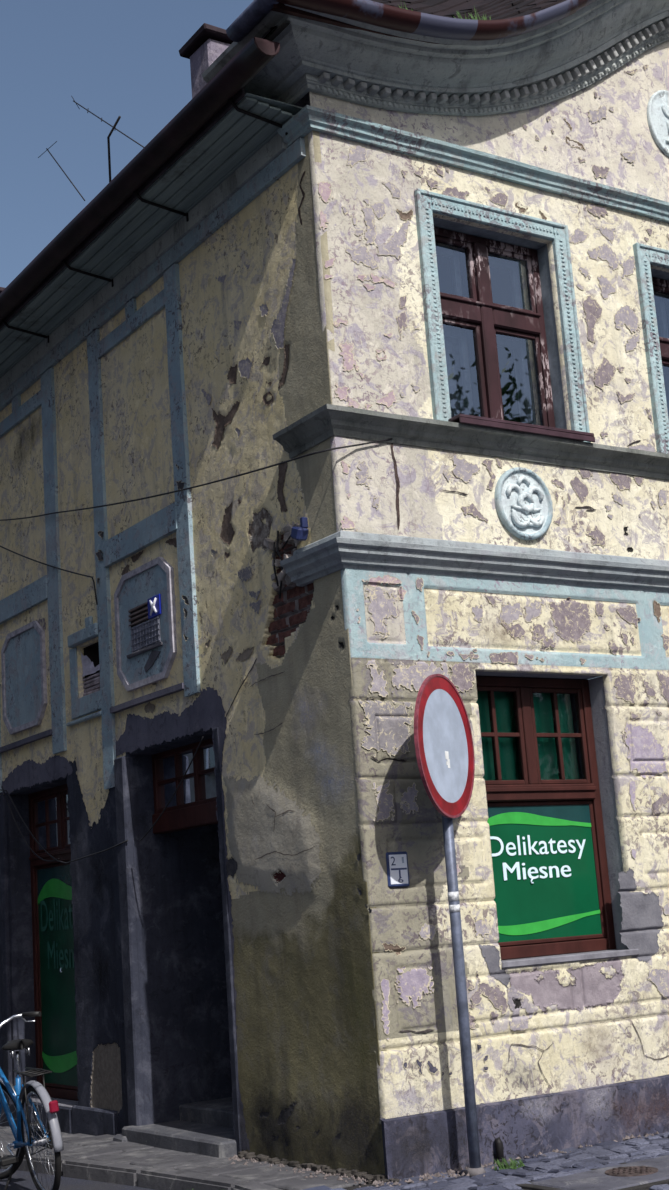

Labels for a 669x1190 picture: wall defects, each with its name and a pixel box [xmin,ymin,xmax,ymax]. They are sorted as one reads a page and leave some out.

crack [297,171,305,225]
peeling [318,163,470,360]
peeling [569,203,641,352]
peeling [594,356,635,403]
flaking render [201,389,240,449]
crack [391,443,400,530]
peeling [551,468,593,525]
peeling [605,472,645,519]
flaking render [205,461,314,664]
crack [251,797,315,860]
flaking render [466,849,669,1032]
crack [508,1043,552,1086]